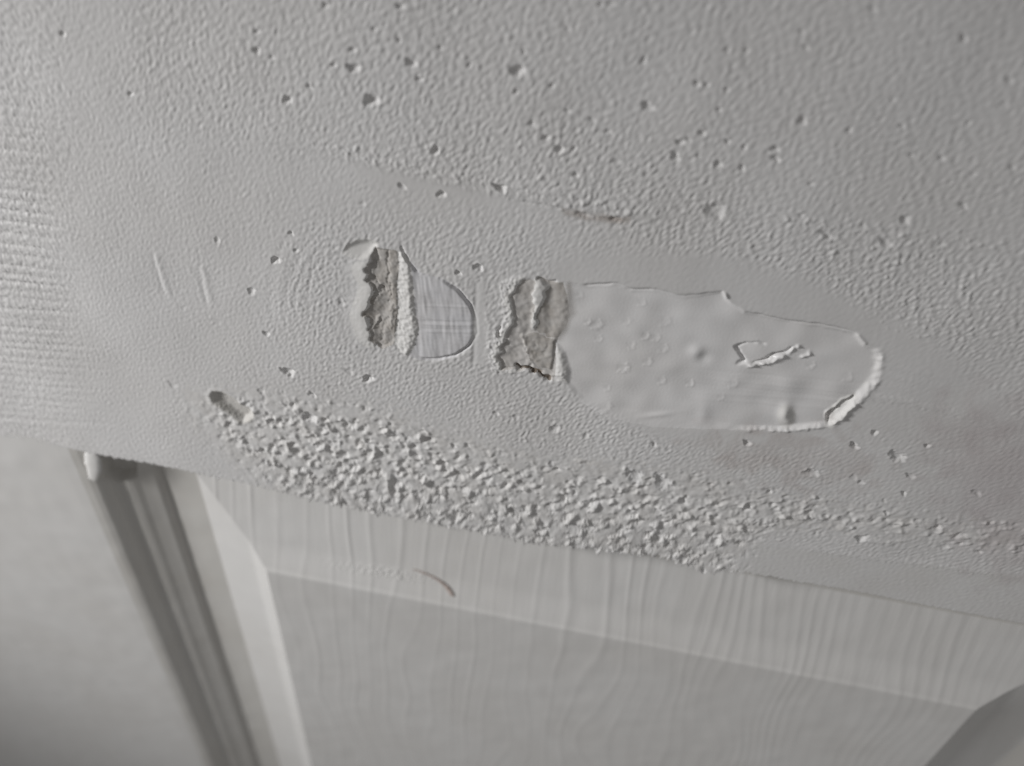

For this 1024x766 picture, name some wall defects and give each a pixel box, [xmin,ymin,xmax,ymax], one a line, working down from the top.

peeling [338,238,484,361]
peeling [491,277,883,448]